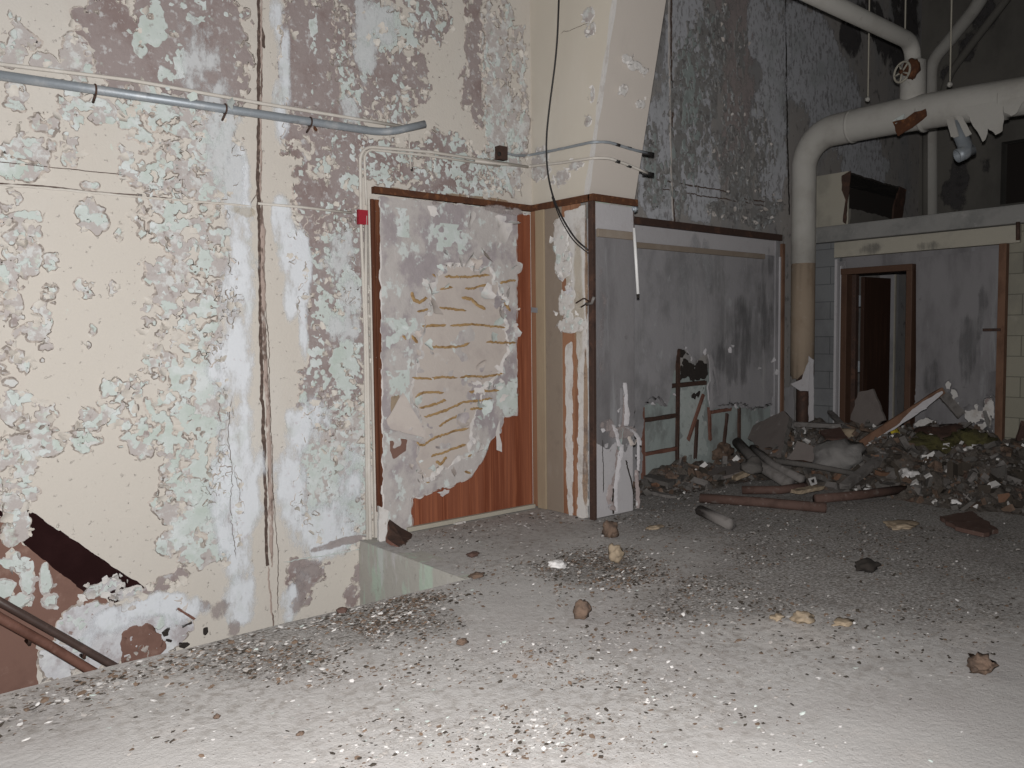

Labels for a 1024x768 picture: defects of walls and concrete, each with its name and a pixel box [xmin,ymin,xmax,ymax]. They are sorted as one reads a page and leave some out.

water stain [638,0,722,224]
peeling [0,0,265,689]
crack [0,0,279,626]
peeling [274,0,588,553]
peeling [913,380,995,433]
peeling [132,696,216,768]
peeling [270,556,846,768]